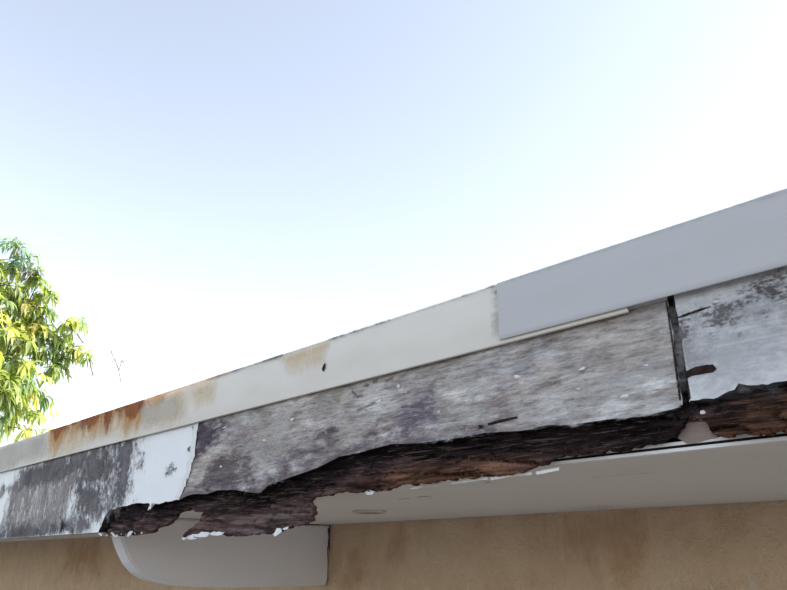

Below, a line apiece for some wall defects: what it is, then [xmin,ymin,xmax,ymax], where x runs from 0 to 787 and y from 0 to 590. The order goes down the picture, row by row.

water stain [702,273,787,334]
rust [49,394,162,453]
peeling [174,301,682,500]
water stain [0,439,145,538]
peeling [182,531,224,540]